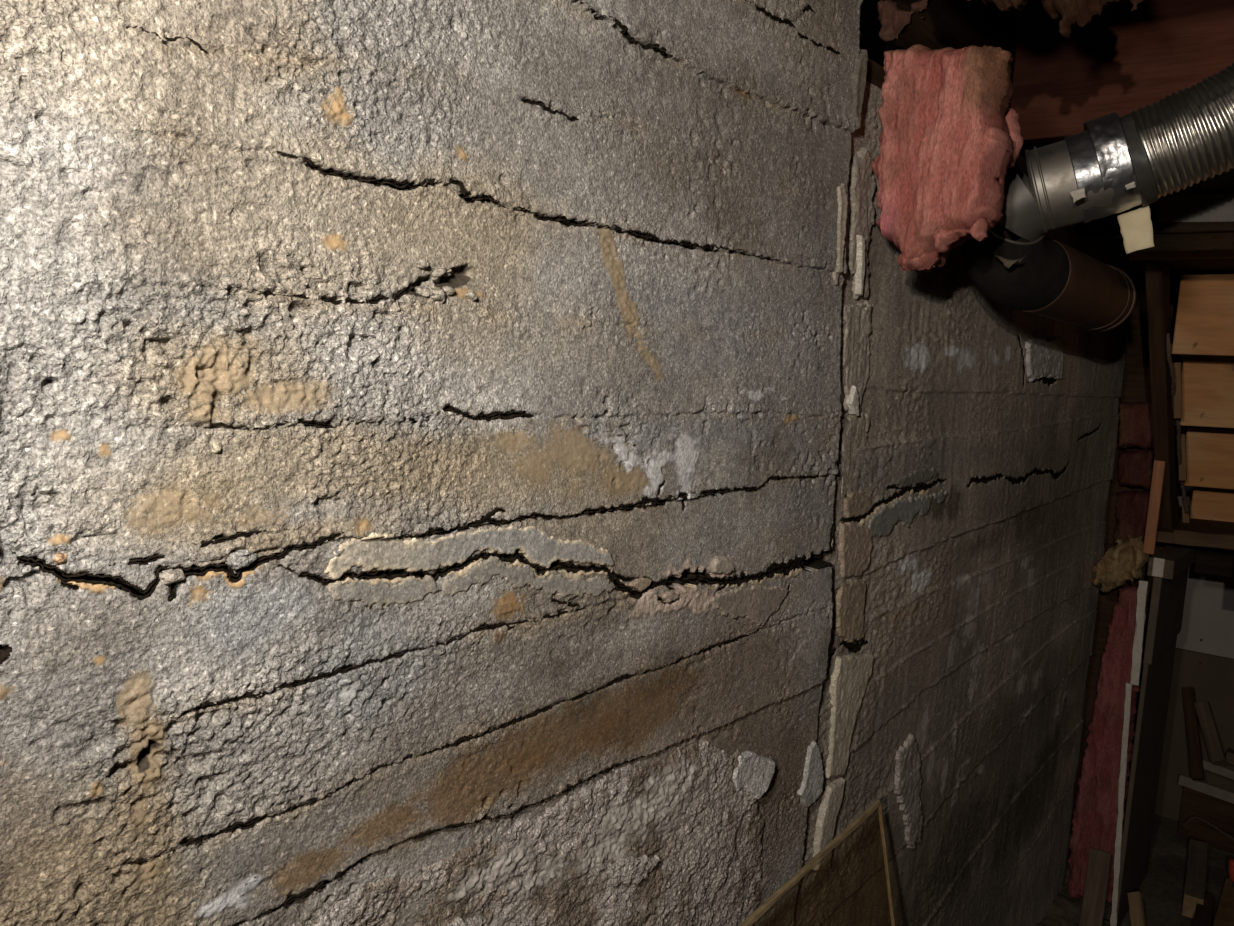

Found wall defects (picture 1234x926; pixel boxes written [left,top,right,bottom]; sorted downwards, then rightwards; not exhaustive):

crack [571,0,676,59]
crack [745,0,848,57]
crack [277,151,780,261]
crack [253,282,418,304]
damp [495,428,702,500]
peeling [324,525,736,620]
crack [10,423,1102,708]
spalling [0,645,12,663]
crack [123,630,759,864]
peeling [732,750,775,800]
crack [234,855,368,926]